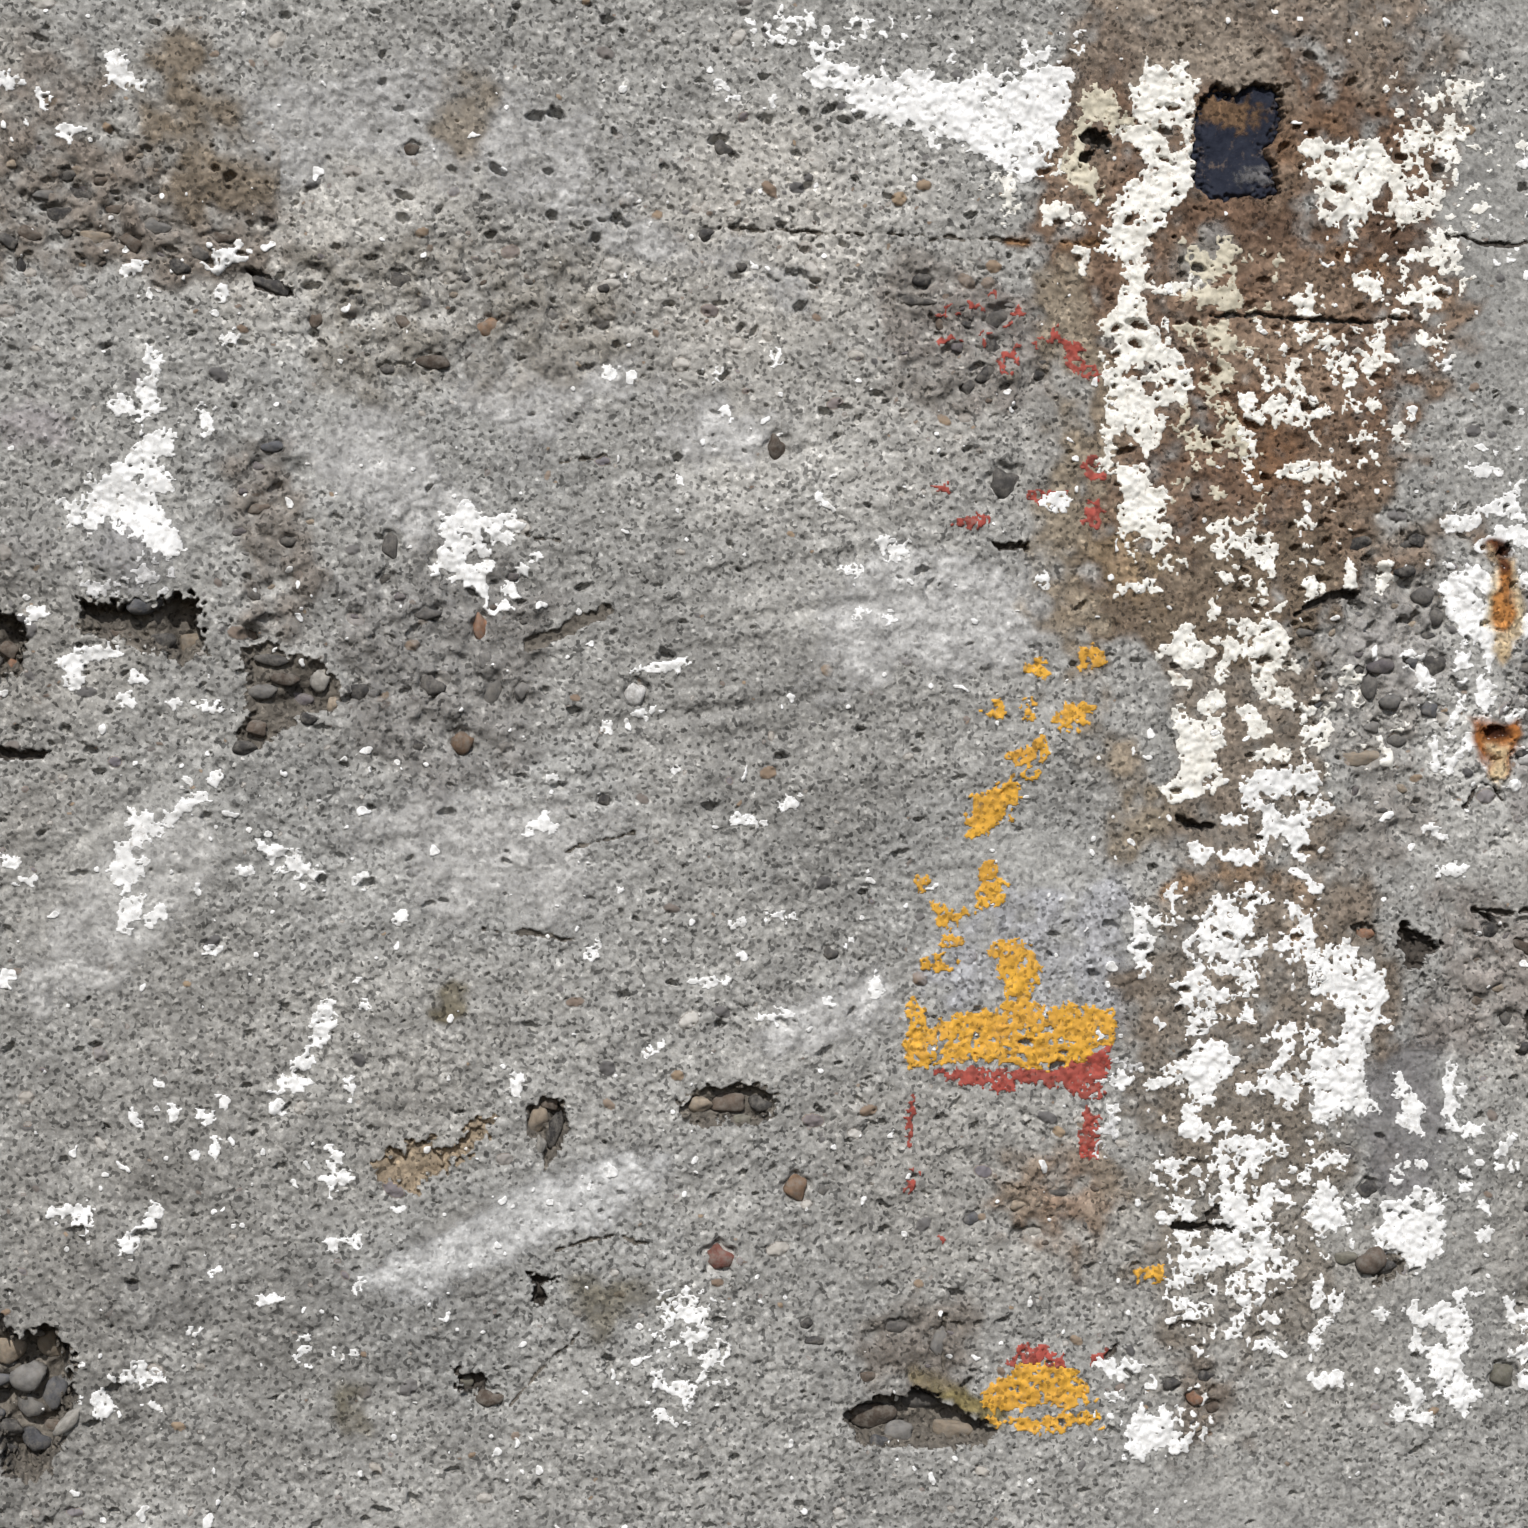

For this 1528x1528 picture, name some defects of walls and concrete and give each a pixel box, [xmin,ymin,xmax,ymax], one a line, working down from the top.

crack [1209,311,1410,326]
crack [1444,233,1528,248]
peeling [54,343,212,709]
peeling [165,441,553,786]
peeling [744,9,1528,1463]
corrosion [1005,0,1523,1348]
peeling [105,769,224,937]
crack [1470,906,1528,939]
peeling [266,998,339,1117]
spalling [370,1071,570,1214]
spalling [675,1081,780,1129]
spalling [0,1313,167,1486]